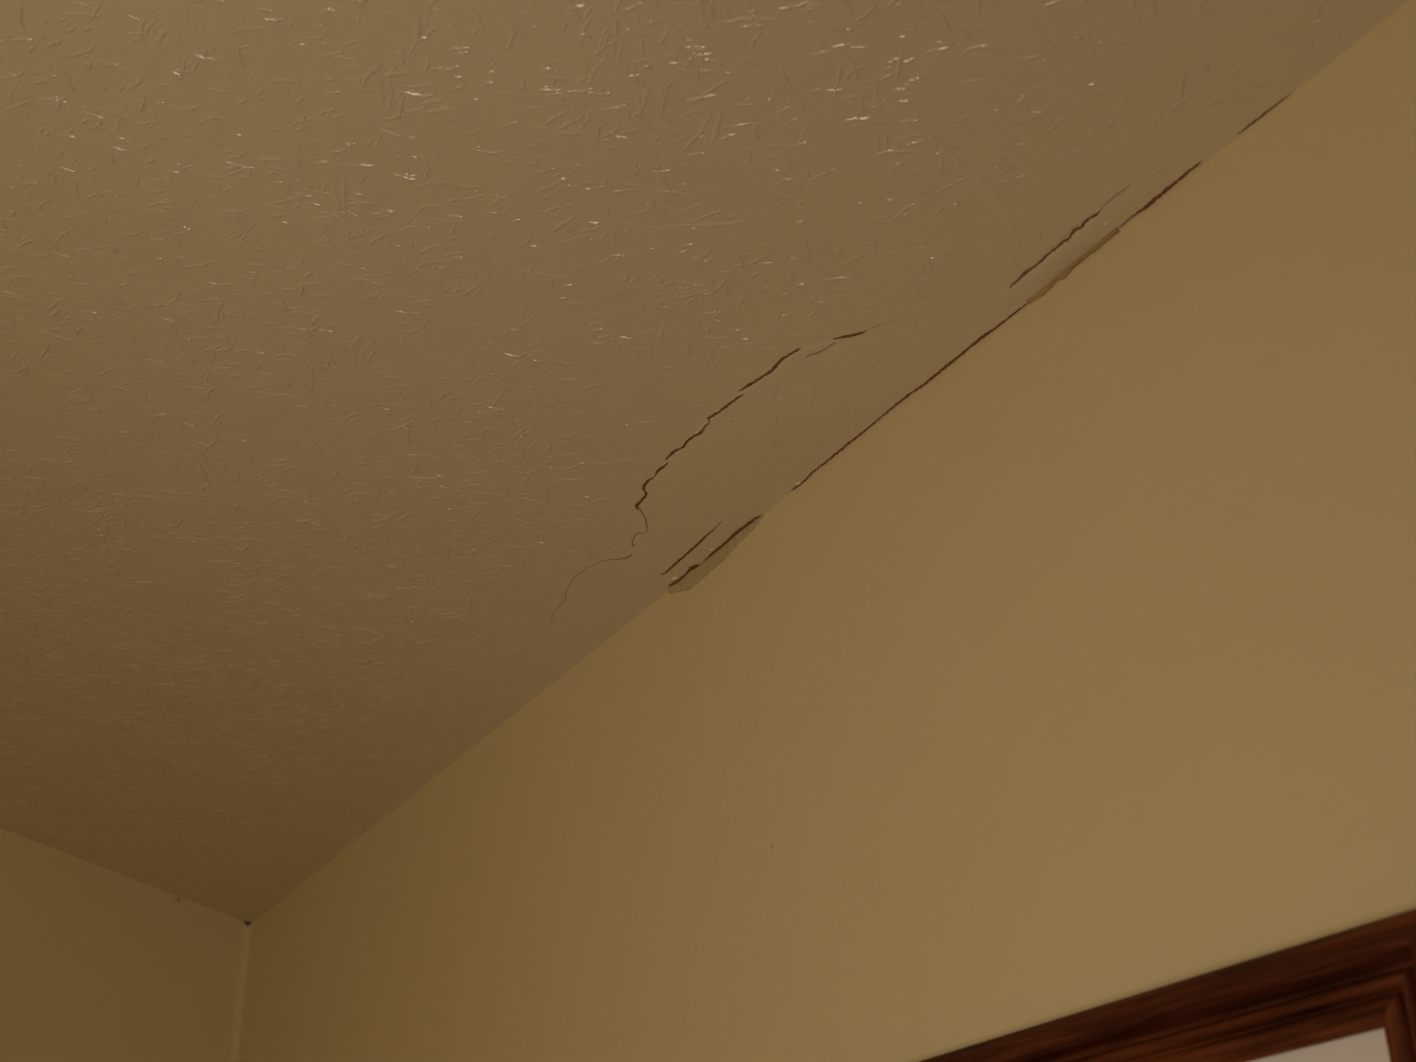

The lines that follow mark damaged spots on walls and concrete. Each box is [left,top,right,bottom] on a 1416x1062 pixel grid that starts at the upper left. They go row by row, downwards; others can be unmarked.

crack [1237,94,1290,135]
crack [550,319,897,622]
crack [790,161,1201,491]